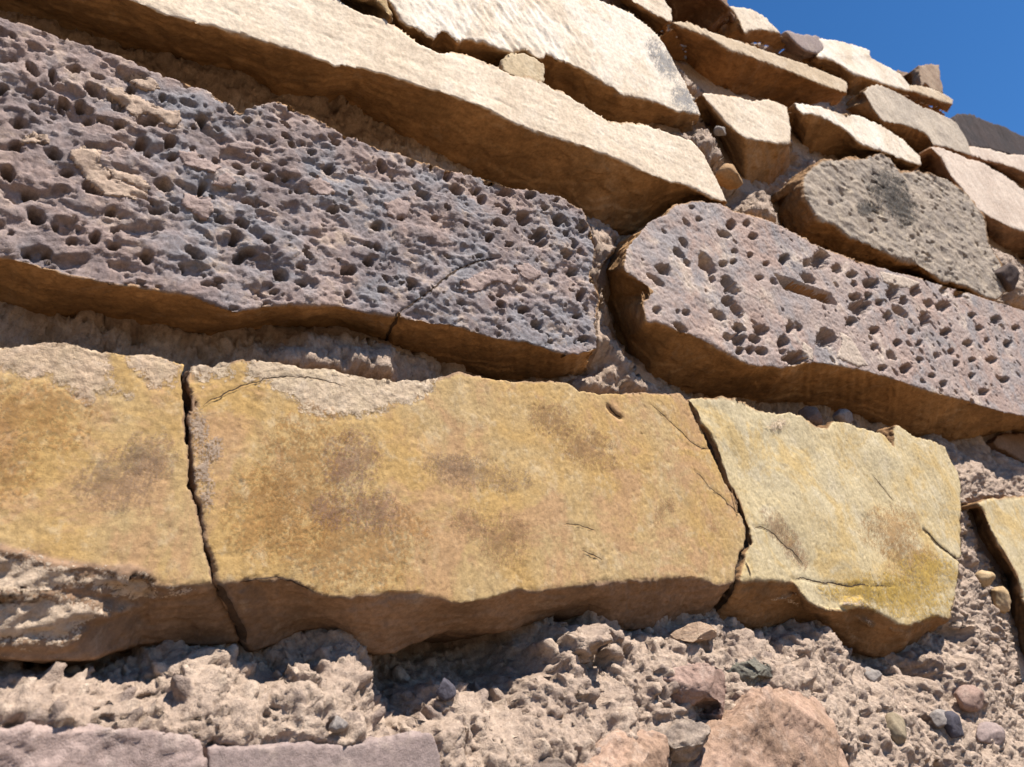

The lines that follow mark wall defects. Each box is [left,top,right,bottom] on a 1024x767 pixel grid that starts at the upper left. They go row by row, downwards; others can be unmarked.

crack [385,257,500,341]
crack [181,374,346,445]
crack [652,405,891,613]
crack [208,563,316,642]